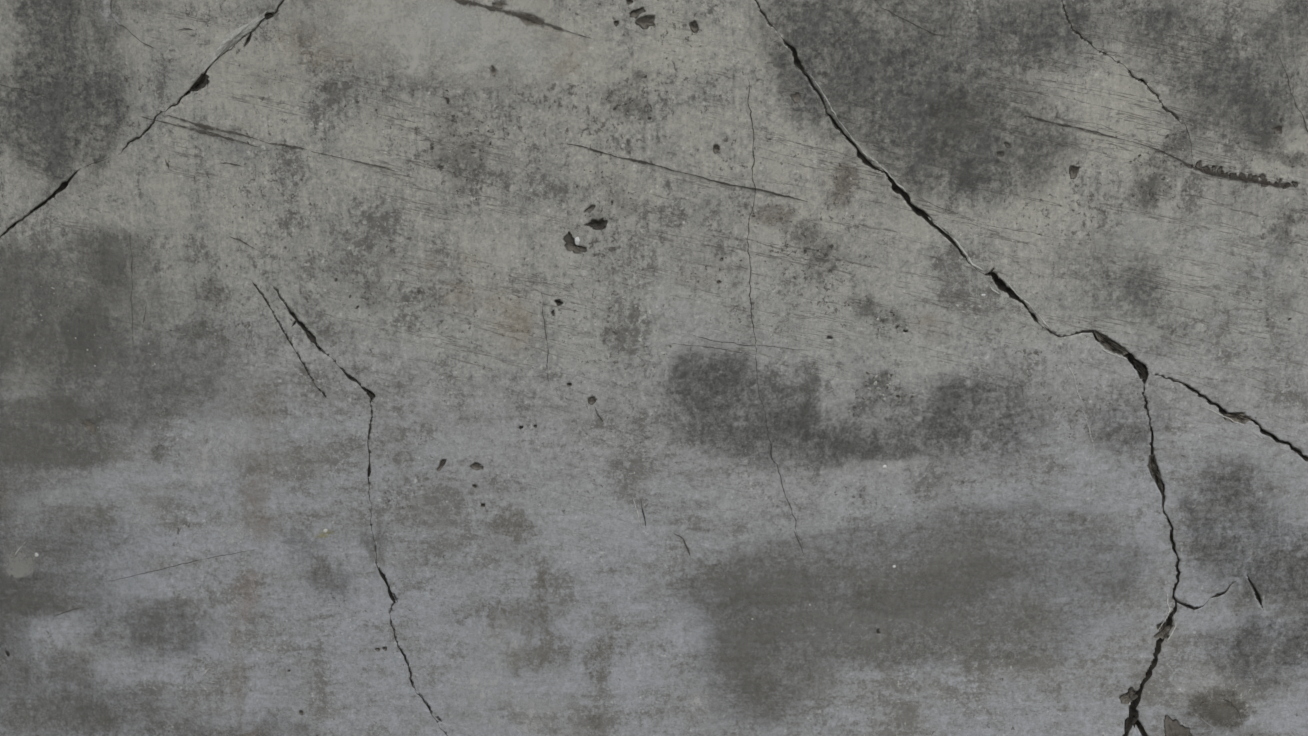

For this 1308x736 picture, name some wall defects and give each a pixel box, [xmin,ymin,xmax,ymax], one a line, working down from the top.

crack [0,0,284,238]
crack [253,283,448,736]
crack [673,76,801,540]
crack [755,0,1308,736]